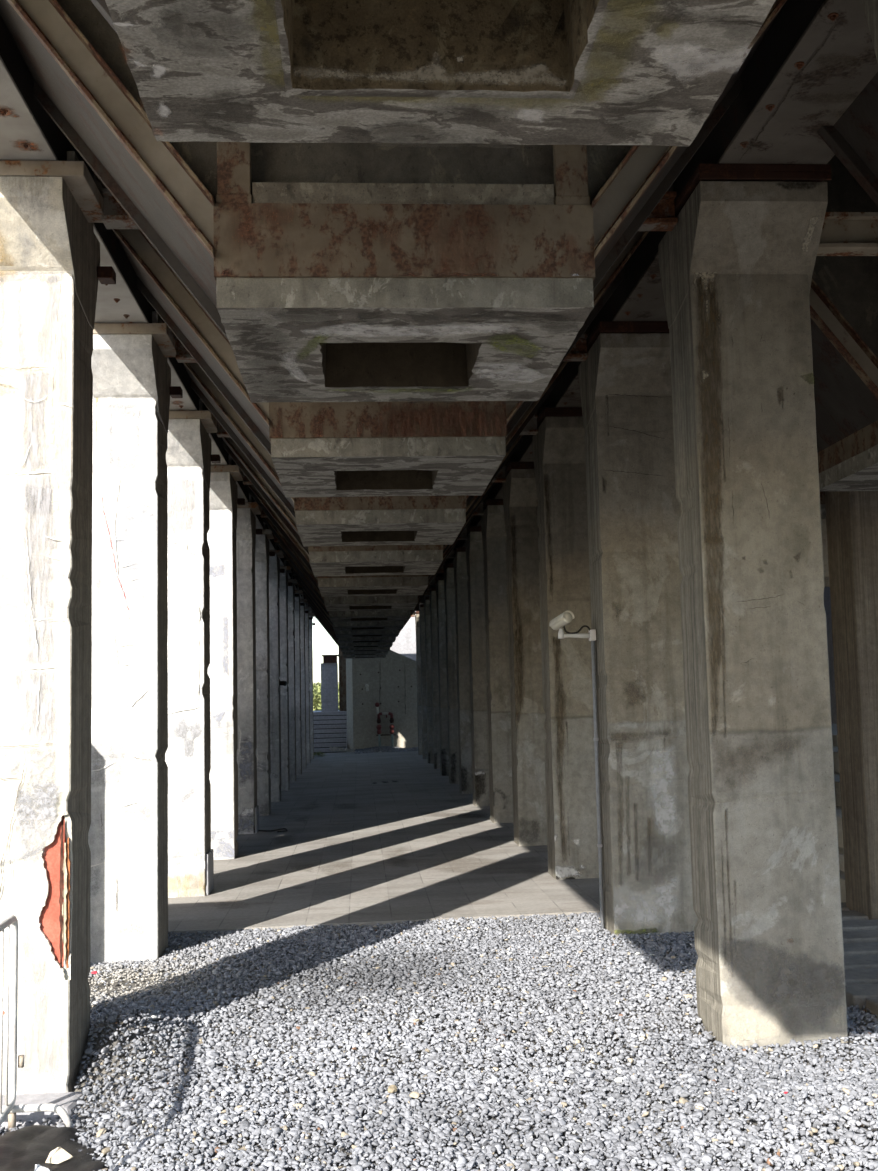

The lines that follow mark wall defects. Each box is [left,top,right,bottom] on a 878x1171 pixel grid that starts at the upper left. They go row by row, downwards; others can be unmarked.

leakage [694,272,726,732]
crack [0,743,49,893]
spalling [40,812,71,969]
leakage [722,860,842,1037]